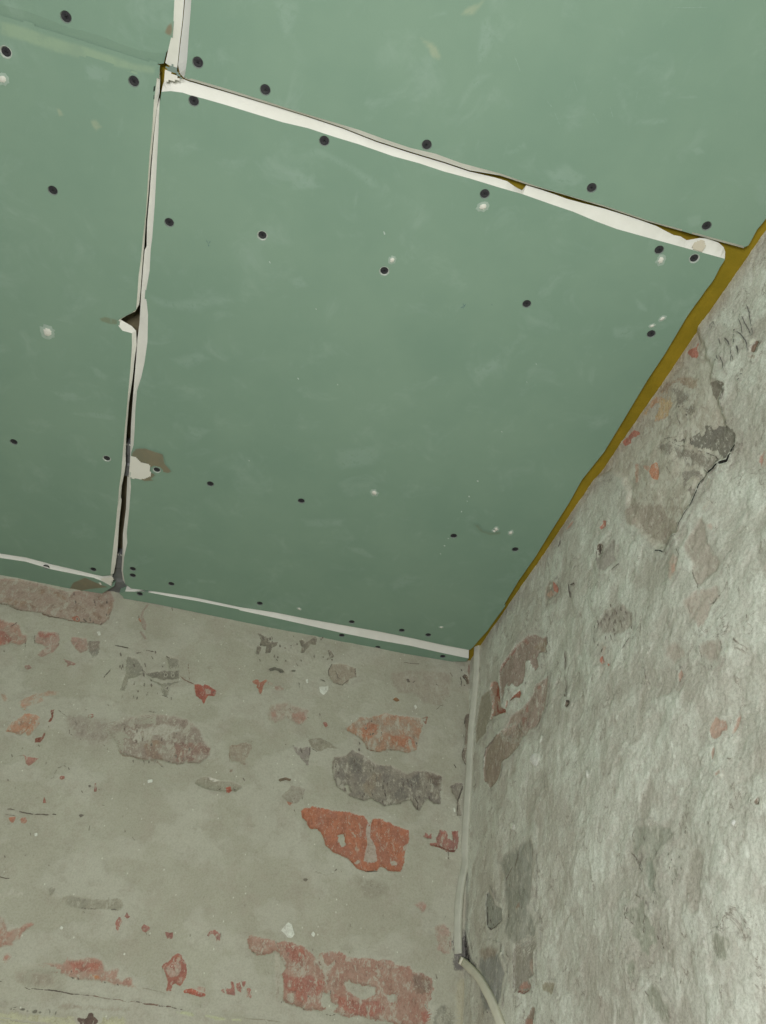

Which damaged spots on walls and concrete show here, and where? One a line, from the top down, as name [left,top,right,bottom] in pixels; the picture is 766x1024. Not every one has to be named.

spalling [587,320,743,595]
crack [654,304,753,553]
flaking render [0,575,256,795]
flaking render [277,631,551,876]
flaking render [0,912,143,994]
flaking render [139,923,253,1000]
flaking render [243,922,438,1024]